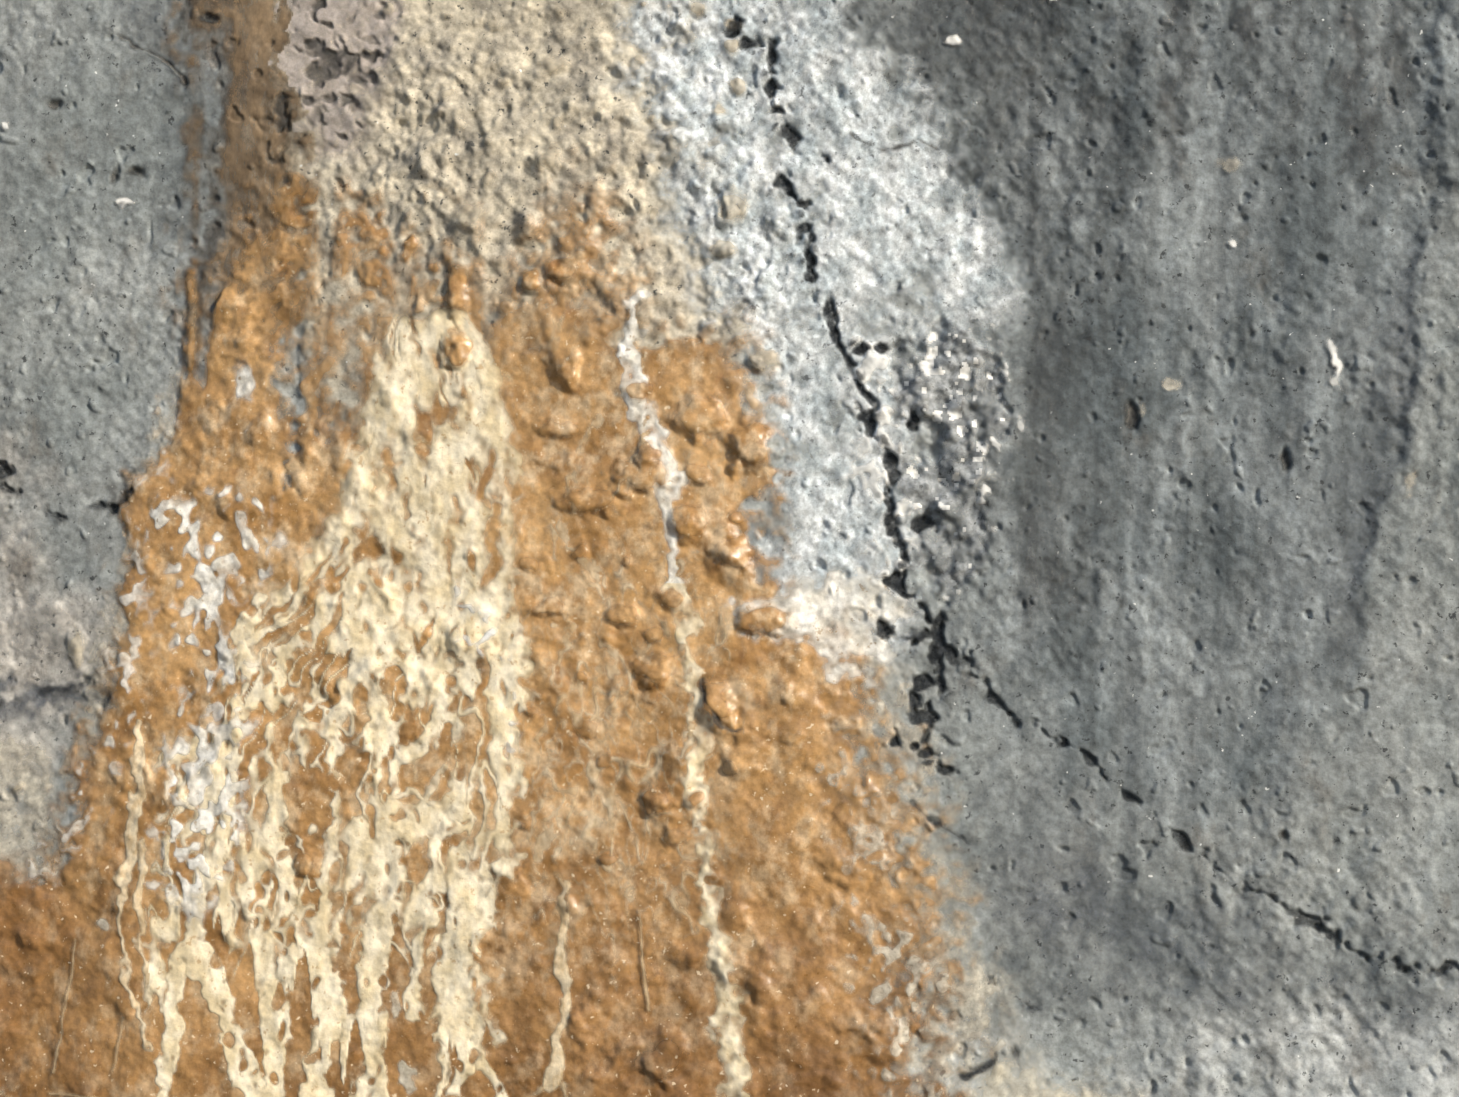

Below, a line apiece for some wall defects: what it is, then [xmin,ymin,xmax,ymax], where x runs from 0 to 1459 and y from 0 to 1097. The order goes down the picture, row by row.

water stain [1233,8,1260,48]
water stain [1334,0,1374,166]
crack [725,16,1018,775]
corrosion [0,0,965,1097]
water stain [612,0,1097,1097]
water stain [0,310,534,1097]
crack [699,677,741,732]
crack [1058,737,1139,804]
crack [910,800,967,842]
crack [1172,831,1190,849]
crack [1268,895,1456,976]